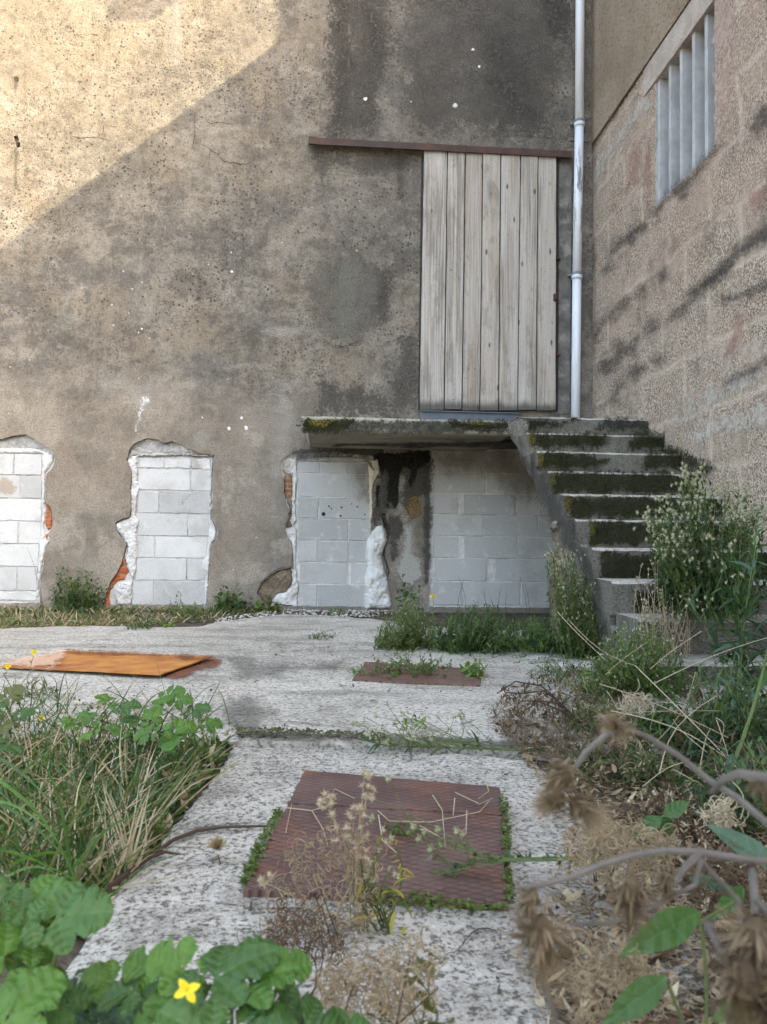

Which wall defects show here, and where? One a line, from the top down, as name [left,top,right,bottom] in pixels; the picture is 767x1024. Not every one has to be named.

damp [311,0,575,181]
crack [192,114,251,170]
flaking render [45,504,53,540]
flaking render [284,475,293,528]
damp [292,441,598,599]
flaking render [105,557,129,605]
flaking render [257,568,292,602]